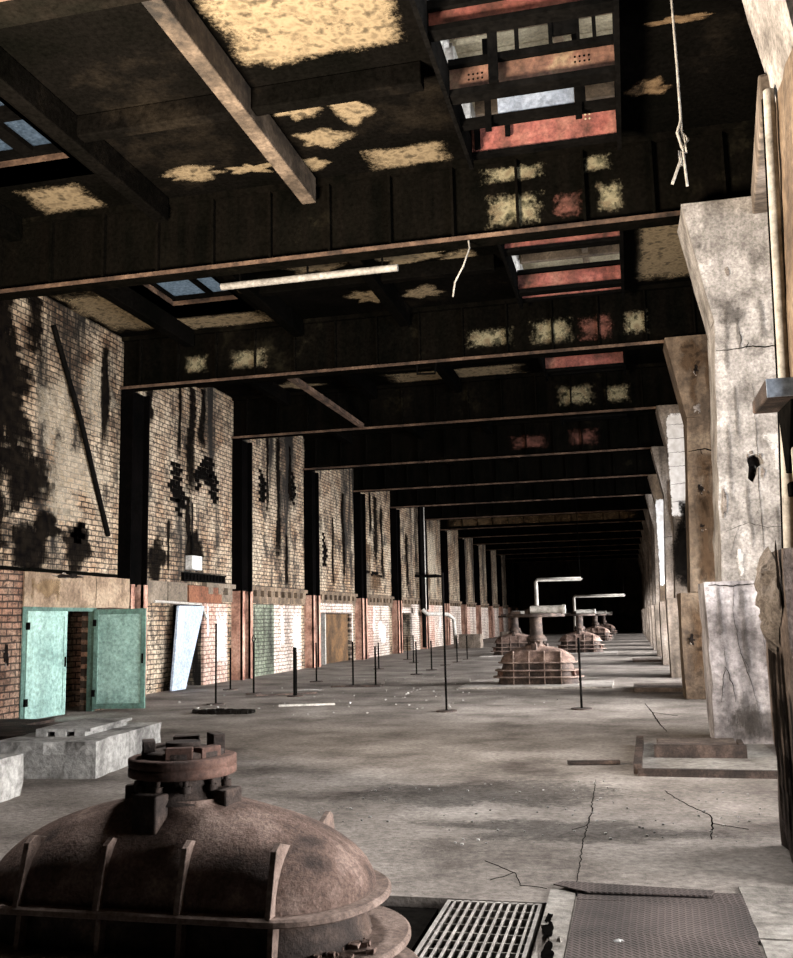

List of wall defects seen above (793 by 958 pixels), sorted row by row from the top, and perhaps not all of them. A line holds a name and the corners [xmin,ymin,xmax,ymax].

peeling [197,0,400,65]
peeling [275,101,375,148]
peeling [166,163,272,182]
peeling [362,142,450,168]
peeling [22,186,102,213]
damp [101,347,111,443]
damp [177,387,206,555]
spalling [747,450,766,482]
crack [572,781,596,882]
crack [666,791,746,840]
crack [486,861,547,889]
spalling [541,913,564,958]